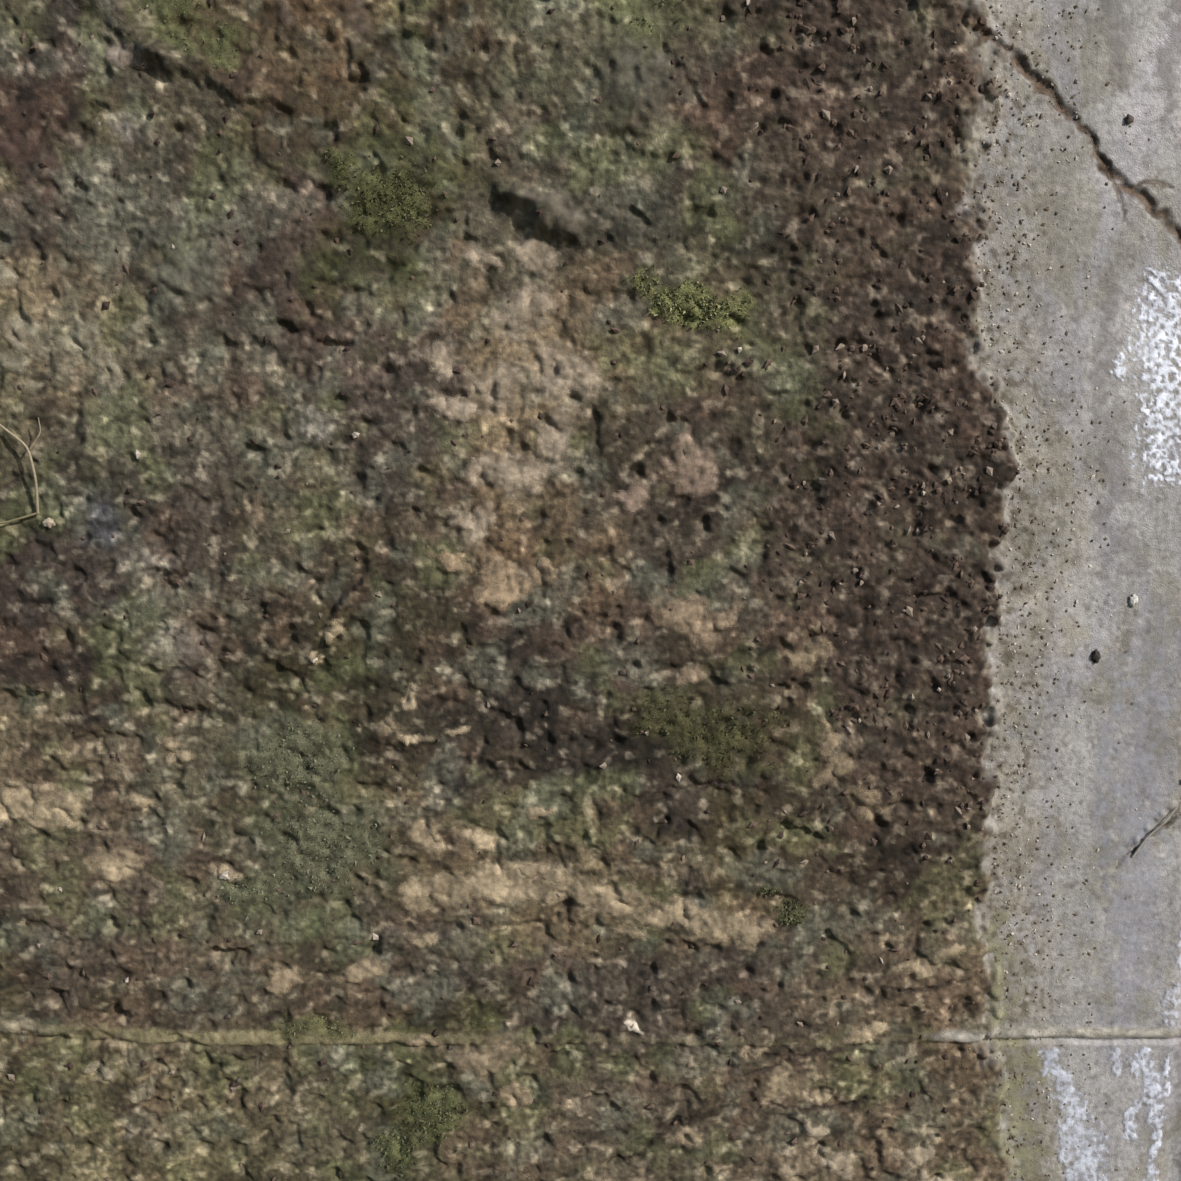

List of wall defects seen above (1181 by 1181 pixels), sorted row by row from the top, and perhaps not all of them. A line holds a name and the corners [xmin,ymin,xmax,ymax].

crack [954,6,1181,244]
leakage [1111,268,1181,486]
leakage [1024,1047,1113,1181]
leakage [1111,1047,1171,1181]